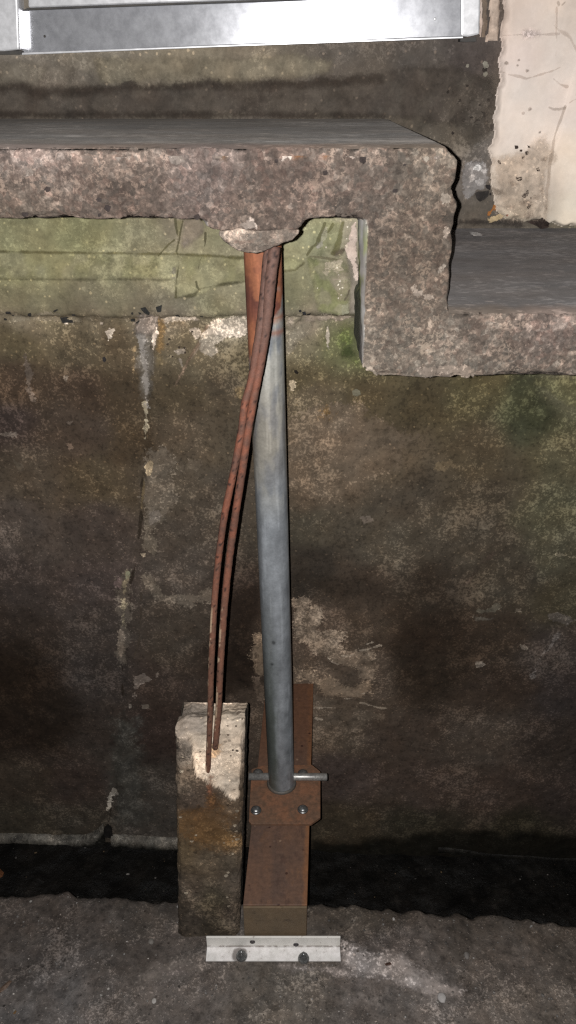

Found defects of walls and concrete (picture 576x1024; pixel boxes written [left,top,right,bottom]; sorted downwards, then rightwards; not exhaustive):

leakage [0,55,496,130]
leakage [240,217,257,229]
spalling [0,222,358,773]